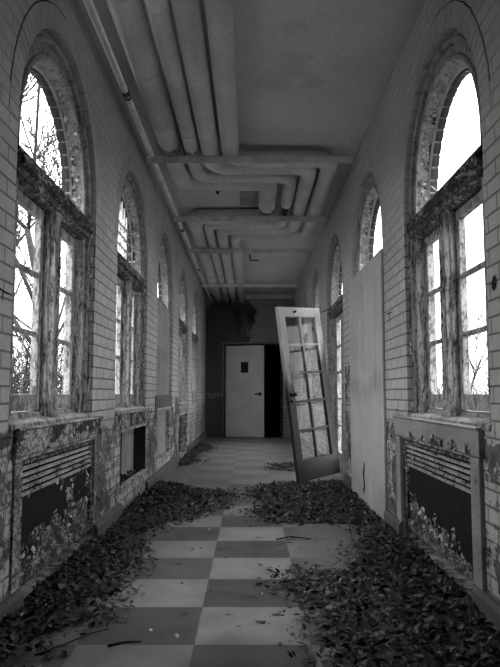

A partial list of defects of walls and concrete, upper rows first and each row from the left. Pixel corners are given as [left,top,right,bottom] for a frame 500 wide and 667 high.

crack [10,0,67,82]
crack [433,0,490,80]
peeling [55,223,63,365]
peeling [406,159,473,355]
peeling [0,468,12,560]
peeling [20,418,120,563]
peeling [118,382,158,476]
peeling [386,421,397,514]
peeling [408,431,470,455]
peeling [409,466,473,565]
peeling [484,435,500,486]
peeling [484,524,500,594]